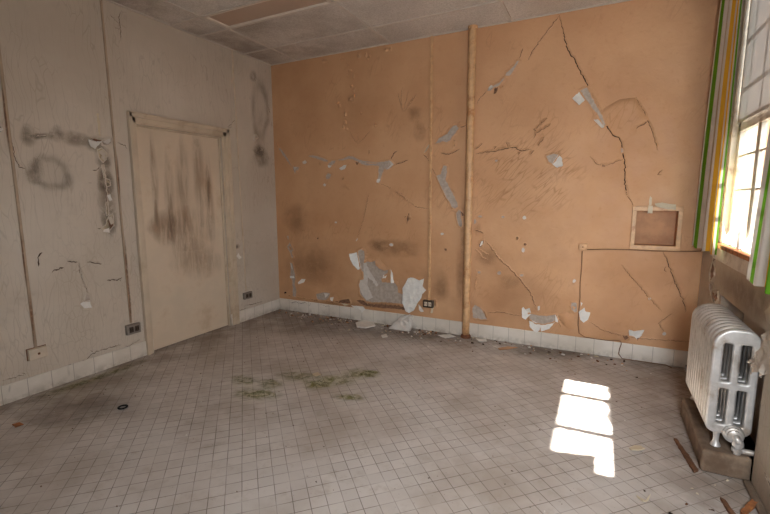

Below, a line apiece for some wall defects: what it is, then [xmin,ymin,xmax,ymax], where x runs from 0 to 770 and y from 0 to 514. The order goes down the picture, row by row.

crack [441,118,551,156]
peeling [573,86,607,128]
crack [528,15,659,205]
peeling [423,121,485,249]
peeling [284,234,438,328]
peeling [470,303,559,333]
crack [589,252,689,342]